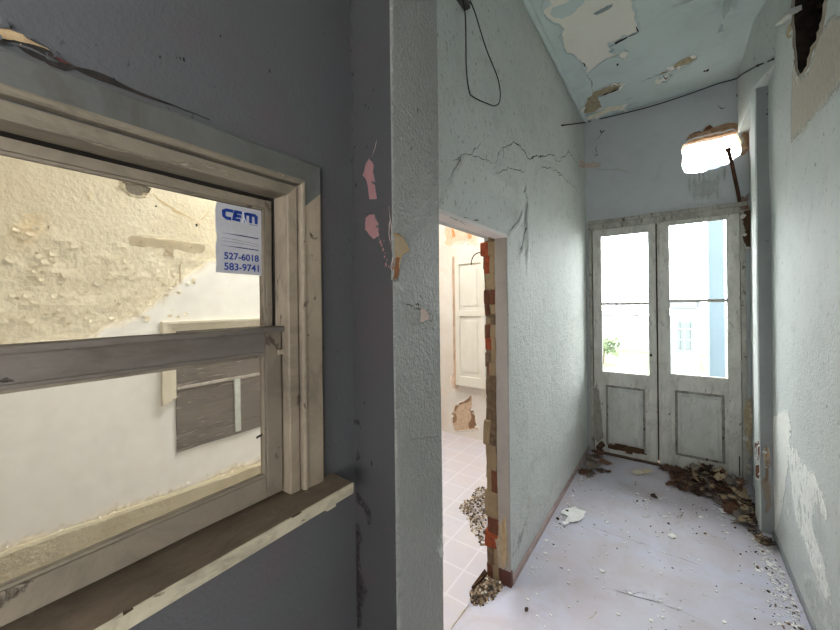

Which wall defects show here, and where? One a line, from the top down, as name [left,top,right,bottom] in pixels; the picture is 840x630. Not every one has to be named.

peeling [0,17,74,67]
peeling [540,0,641,76]
spalling [653,53,700,85]
flaking render [774,0,840,140]
spalling [580,81,628,121]
spalling [682,121,749,156]
spalling [118,180,153,198]
peeling [362,157,378,200]
crack [492,133,583,265]
spalling [364,213,411,282]
flaking render [451,237,499,581]